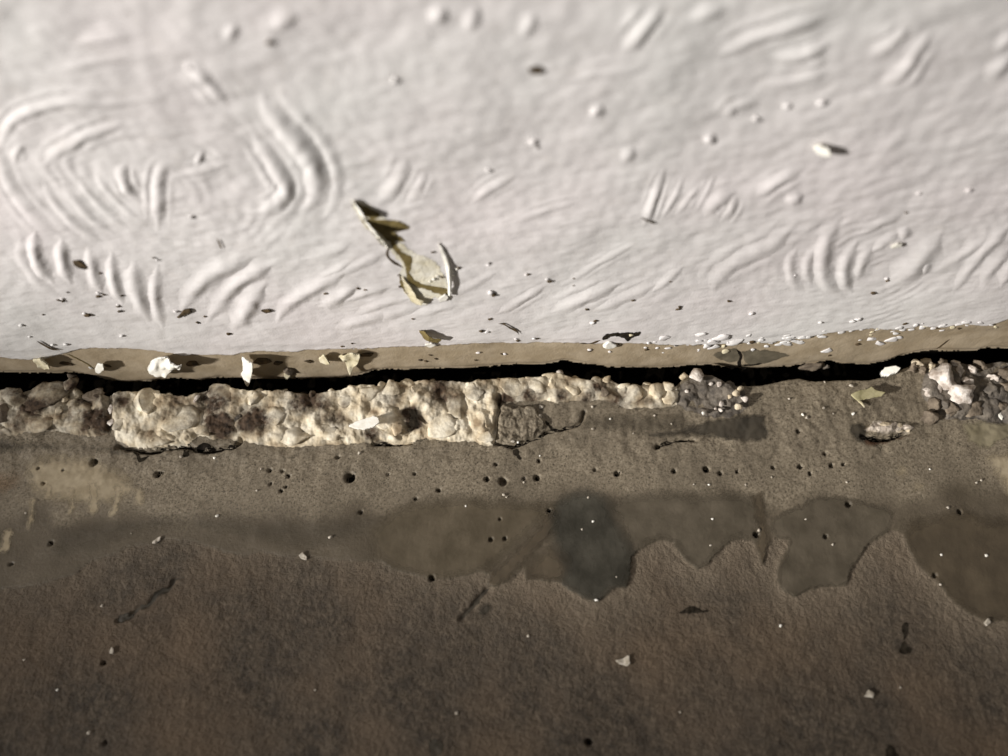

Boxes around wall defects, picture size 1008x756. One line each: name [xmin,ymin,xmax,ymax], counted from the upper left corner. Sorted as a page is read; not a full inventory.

peeling [351,200,460,306]
crack [0,339,1008,397]
spalling [0,320,1008,450]
crack [118,577,184,623]
damp [373,492,892,600]
damp [907,514,1008,621]